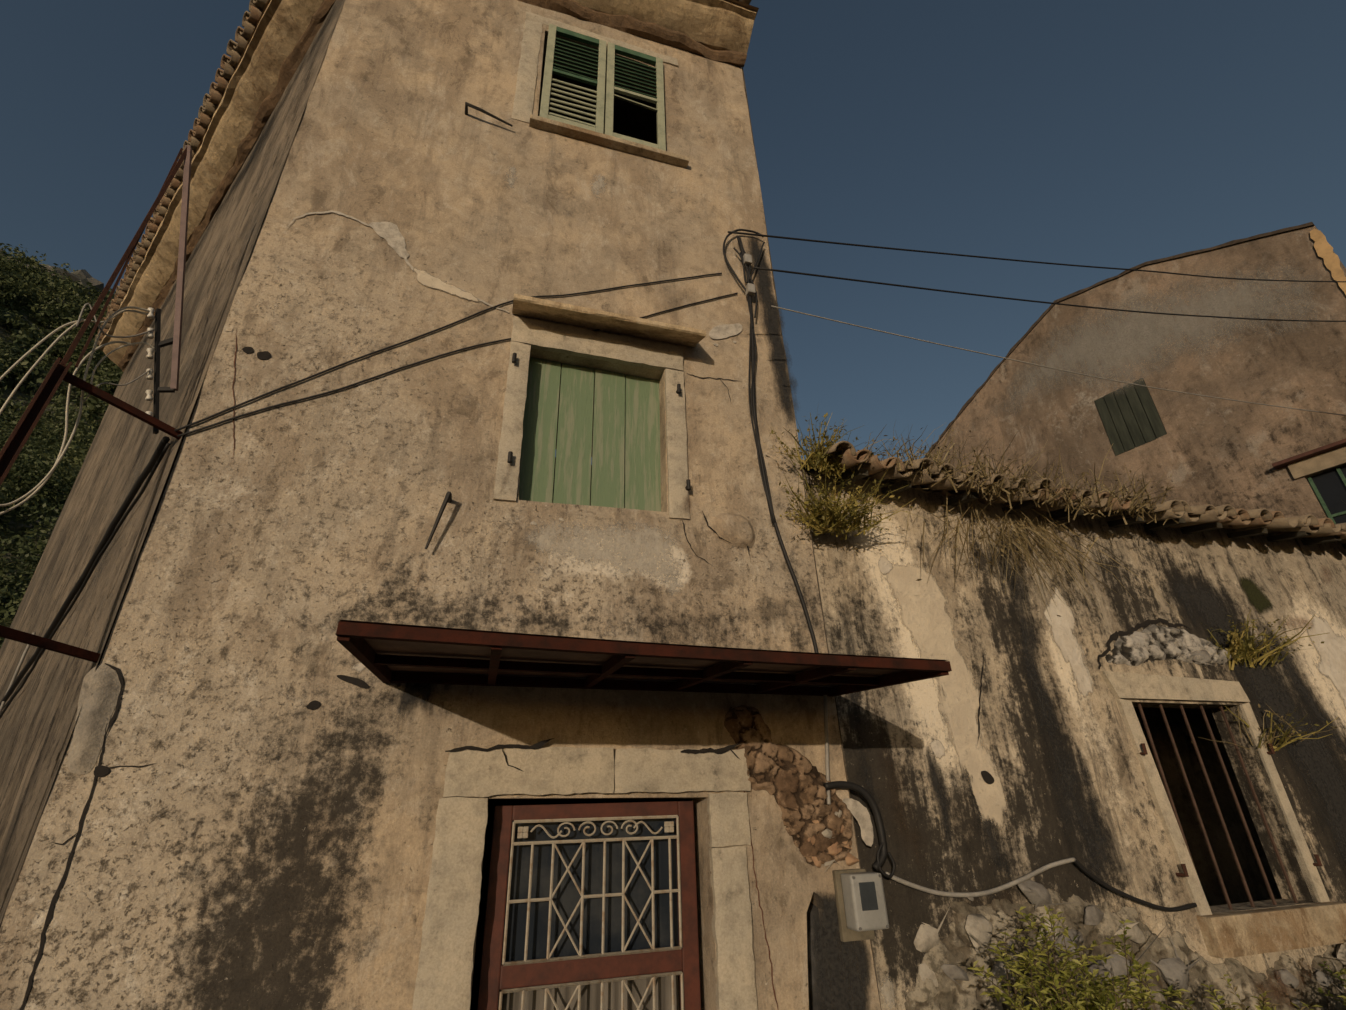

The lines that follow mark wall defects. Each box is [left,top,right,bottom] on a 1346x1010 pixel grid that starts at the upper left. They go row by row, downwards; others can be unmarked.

crack [20,725,155,1010]
crack [445,738,555,772]
flaking render [724,705,874,874]
water stain [926,750,952,844]
water stain [967,771,1009,874]
water stain [991,542,1122,889]
flaking render [1044,587,1231,697]
water stain [1166,569,1346,868]